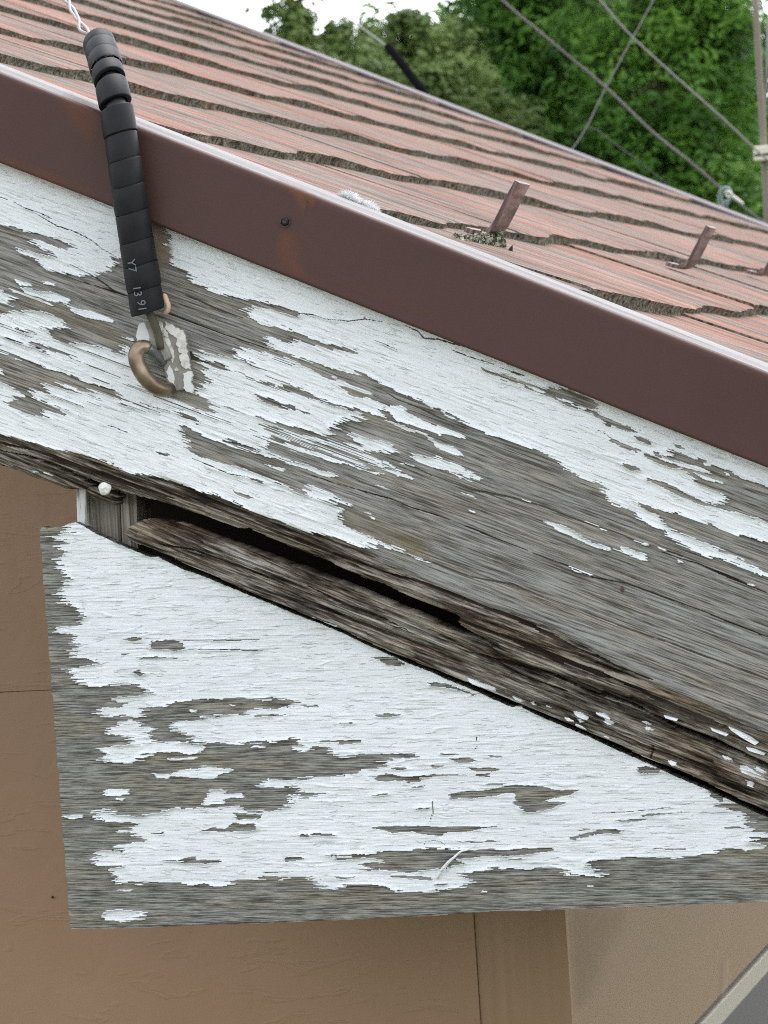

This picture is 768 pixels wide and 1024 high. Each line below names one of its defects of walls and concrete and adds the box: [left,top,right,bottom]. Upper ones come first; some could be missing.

crack [161,544,276,580]
crack [183,639,260,651]
peeling [0,222,768,788]
peeling [40,526,768,929]
crack [226,441,768,637]